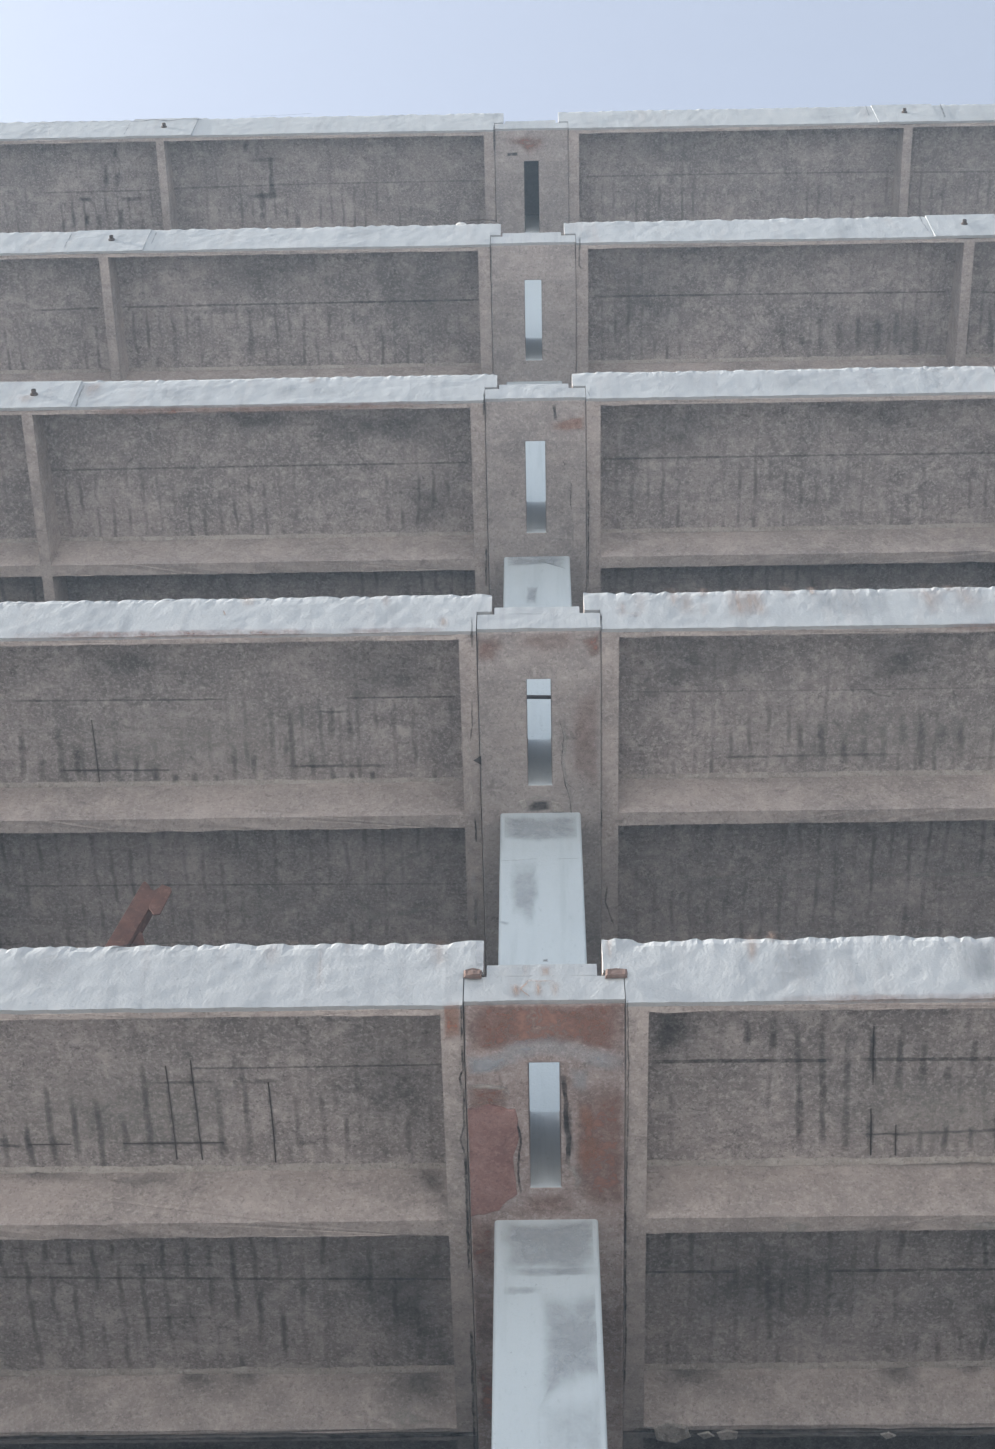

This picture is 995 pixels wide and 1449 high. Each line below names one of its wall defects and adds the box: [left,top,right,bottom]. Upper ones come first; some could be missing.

rust [479,959,615,1048]
rust [481,1373,492,1418]